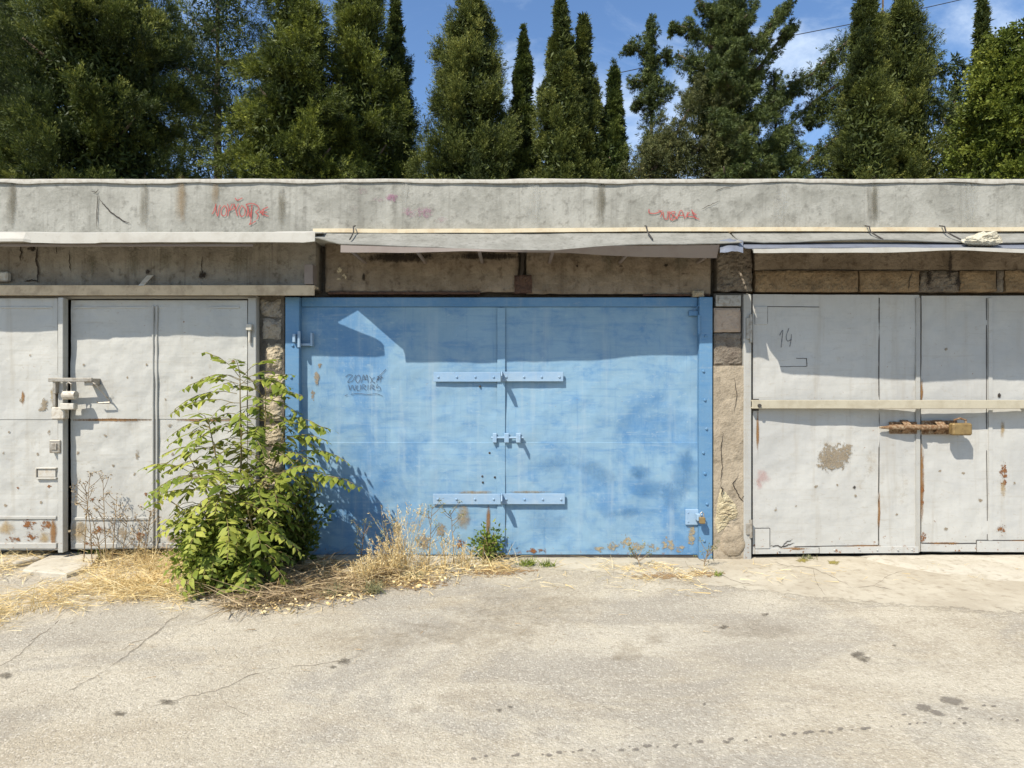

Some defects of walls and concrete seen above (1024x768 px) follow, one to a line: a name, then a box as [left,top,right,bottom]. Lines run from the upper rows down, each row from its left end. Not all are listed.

crack [92,190,129,226]
rust [2,519,56,543]